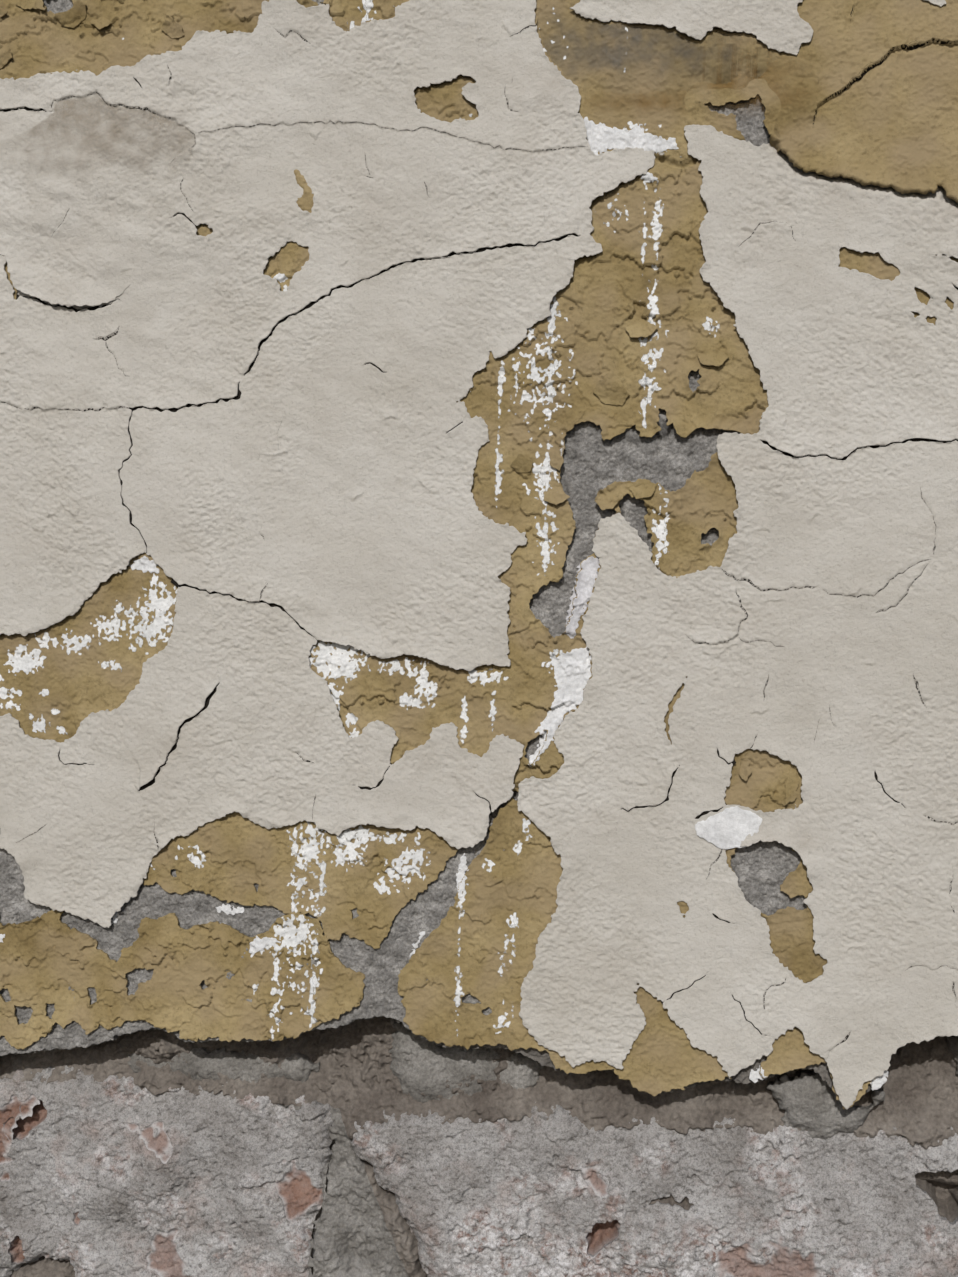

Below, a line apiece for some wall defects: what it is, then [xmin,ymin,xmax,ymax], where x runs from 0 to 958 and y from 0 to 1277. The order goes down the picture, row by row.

peeling [0,0,269,80]
crack [0,65,585,151]
crack [813,39,958,124]
crack [1,233,578,547]
peeling [294,0,958,792]
crack [762,438,958,460]
peeling [0,553,178,743]
crack [171,578,318,641]
crack [138,684,219,791]
peeling [724,749,803,812]
peeling [0,798,731,1096]
peeling [726,840,827,983]